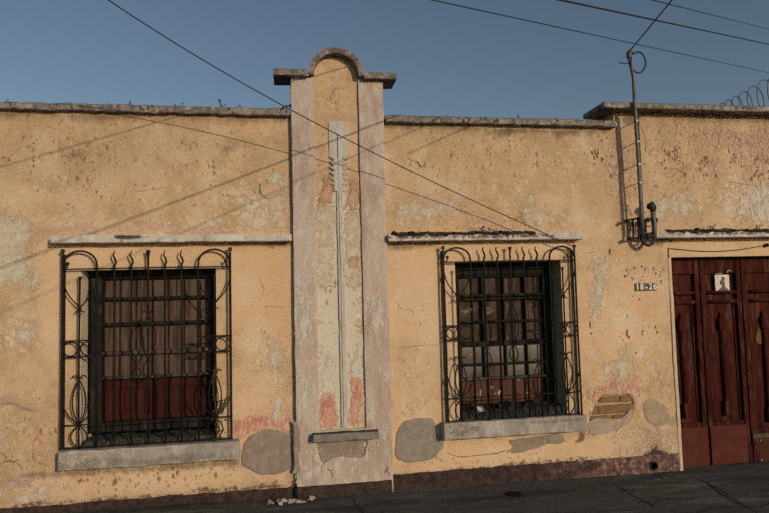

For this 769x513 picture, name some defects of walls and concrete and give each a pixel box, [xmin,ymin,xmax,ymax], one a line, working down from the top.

peeling [0,207,41,295]
peeling [243,168,290,234]
peeling [344,176,362,288]
peeling [386,191,515,231]
peeling [728,133,769,225]
peeling [233,291,316,439]
peeling [298,343,365,430]
flaking render [579,330,642,437]
crack [0,453,49,469]
crack [682,474,769,513]